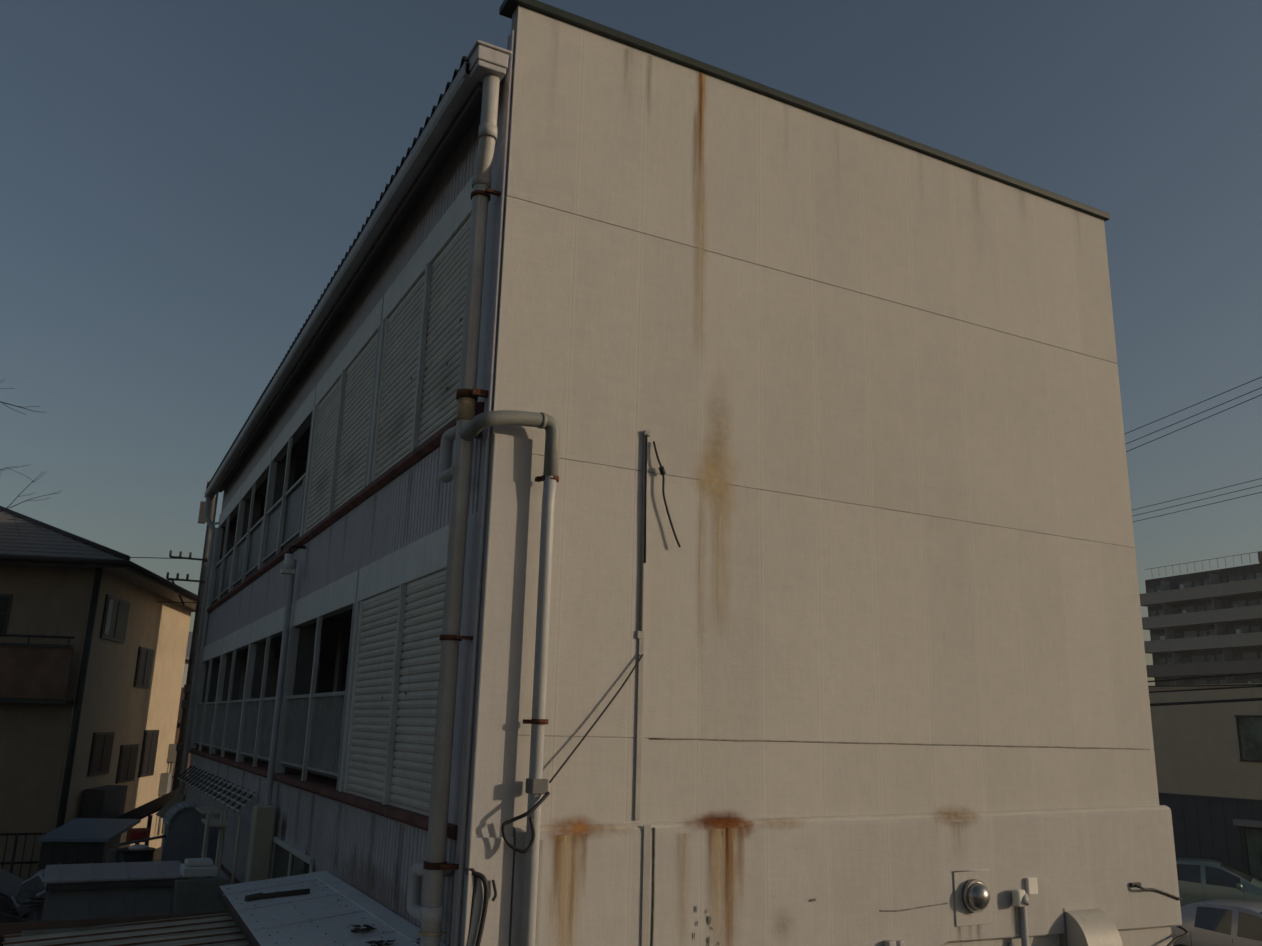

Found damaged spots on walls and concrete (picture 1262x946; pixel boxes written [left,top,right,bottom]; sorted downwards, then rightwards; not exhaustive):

rust [556,821,589,934]
rust [701,815,750,890]